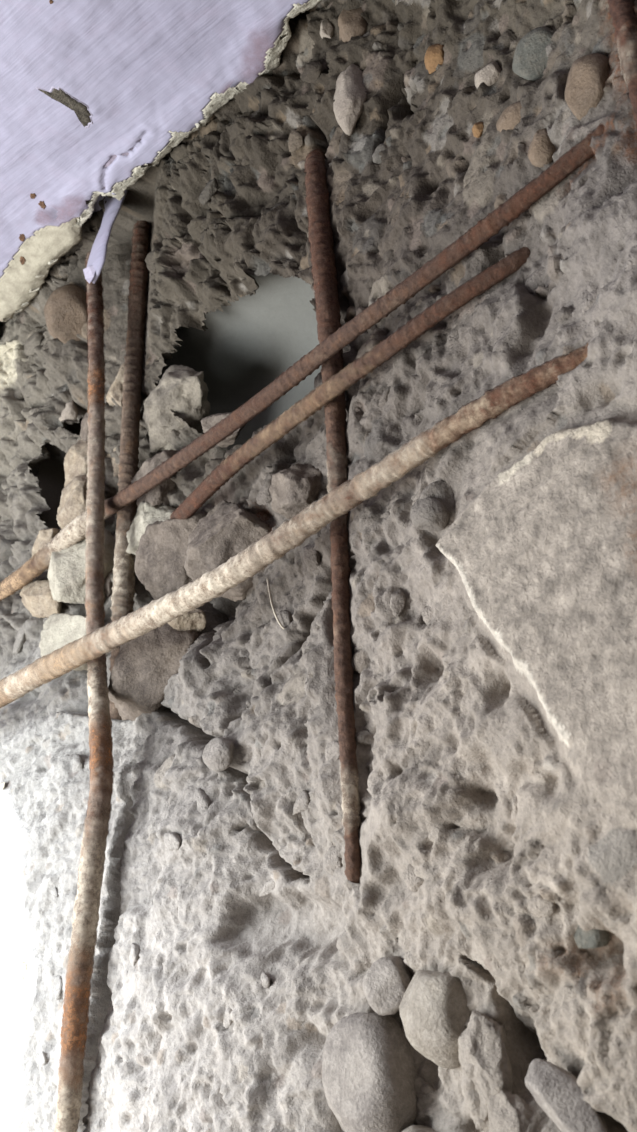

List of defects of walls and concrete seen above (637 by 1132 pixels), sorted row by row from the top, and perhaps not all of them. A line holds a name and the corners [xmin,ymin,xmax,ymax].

spalling [0,511,562,1132]
spalling [0,0,637,708]
spalling [167,109,637,1132]